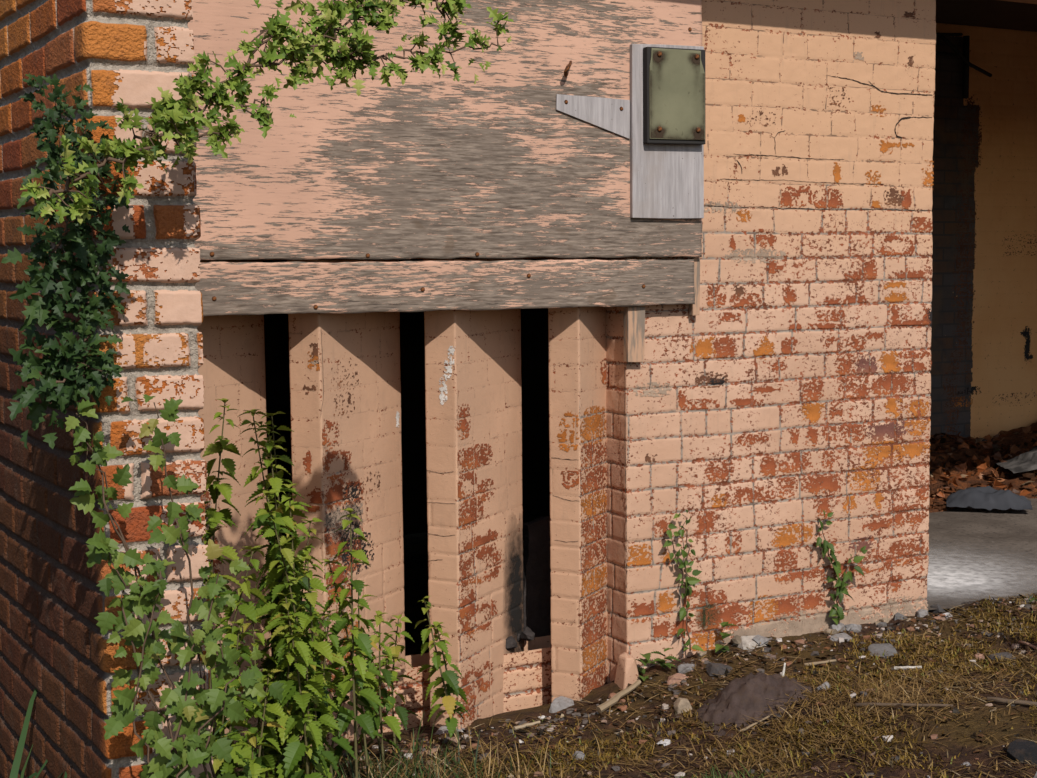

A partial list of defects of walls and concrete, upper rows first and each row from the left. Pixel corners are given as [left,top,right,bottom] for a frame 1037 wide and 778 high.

crack [826,75,932,138]
peeling [102,0,223,742]
flaking render [303,343,381,610]
water stain [439,346,455,405]
flaking render [457,403,506,638]
flaking render [557,406,607,698]
flaking render [461,661,494,725]